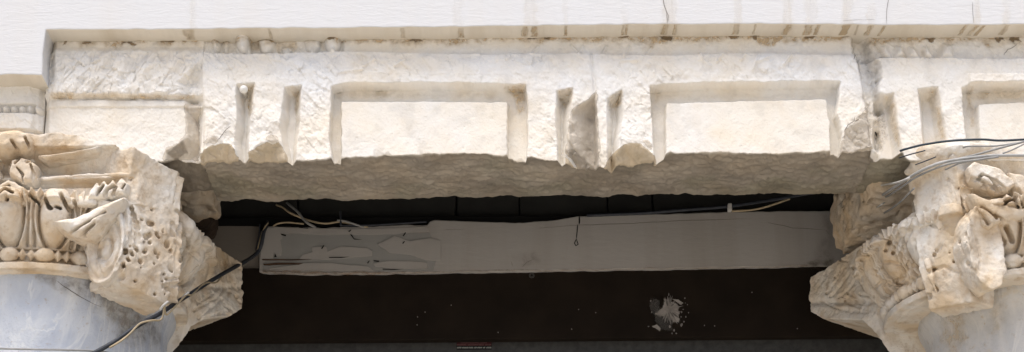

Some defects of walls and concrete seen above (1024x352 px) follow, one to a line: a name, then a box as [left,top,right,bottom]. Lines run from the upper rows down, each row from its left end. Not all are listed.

spalling [565,92,657,173]
spalling [840,107,883,155]
peeling [261,227,441,273]